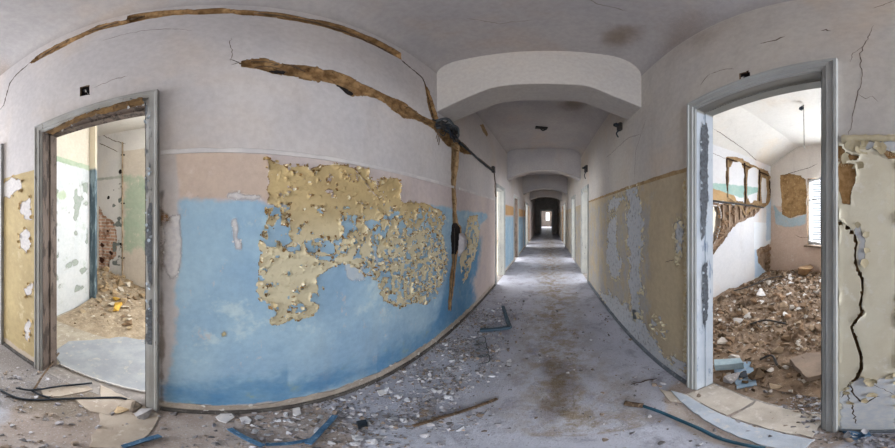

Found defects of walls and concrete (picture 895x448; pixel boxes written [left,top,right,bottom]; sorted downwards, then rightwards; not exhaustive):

crack [848,1,893,134]
peeling [4,175,34,254]
peeling [23,319,32,342]
flaking render [98,207,122,272]
peeling [163,215,182,279]
peeling [227,156,480,326]
peeling [599,178,687,380]
spalling [700,121,764,254]
spalling [780,174,808,218]
crack [839,221,892,423]
peeling [838,134,895,430]